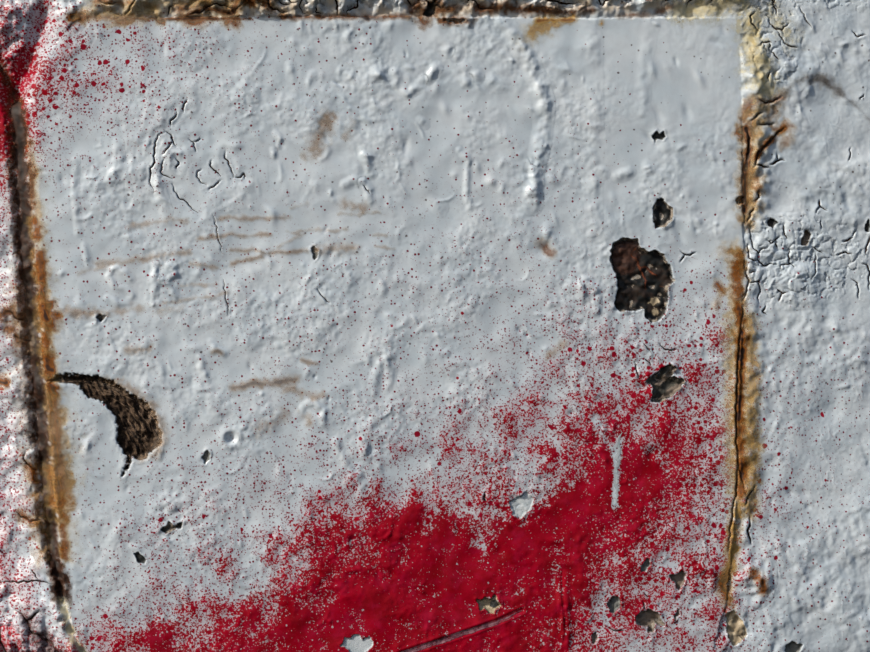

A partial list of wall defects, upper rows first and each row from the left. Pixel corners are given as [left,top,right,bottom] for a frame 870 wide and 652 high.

rust [67,0,595,37]
crack [746,0,812,168]
rust [0,64,75,604]
spalling [45,373,162,476]
crack [149,100,245,253]
spalling [606,234,679,326]
peeling [650,196,676,230]
peeling [642,360,687,405]
rust [714,249,750,498]
crack [728,192,794,551]
rust [735,93,793,227]
crack [812,232,870,295]